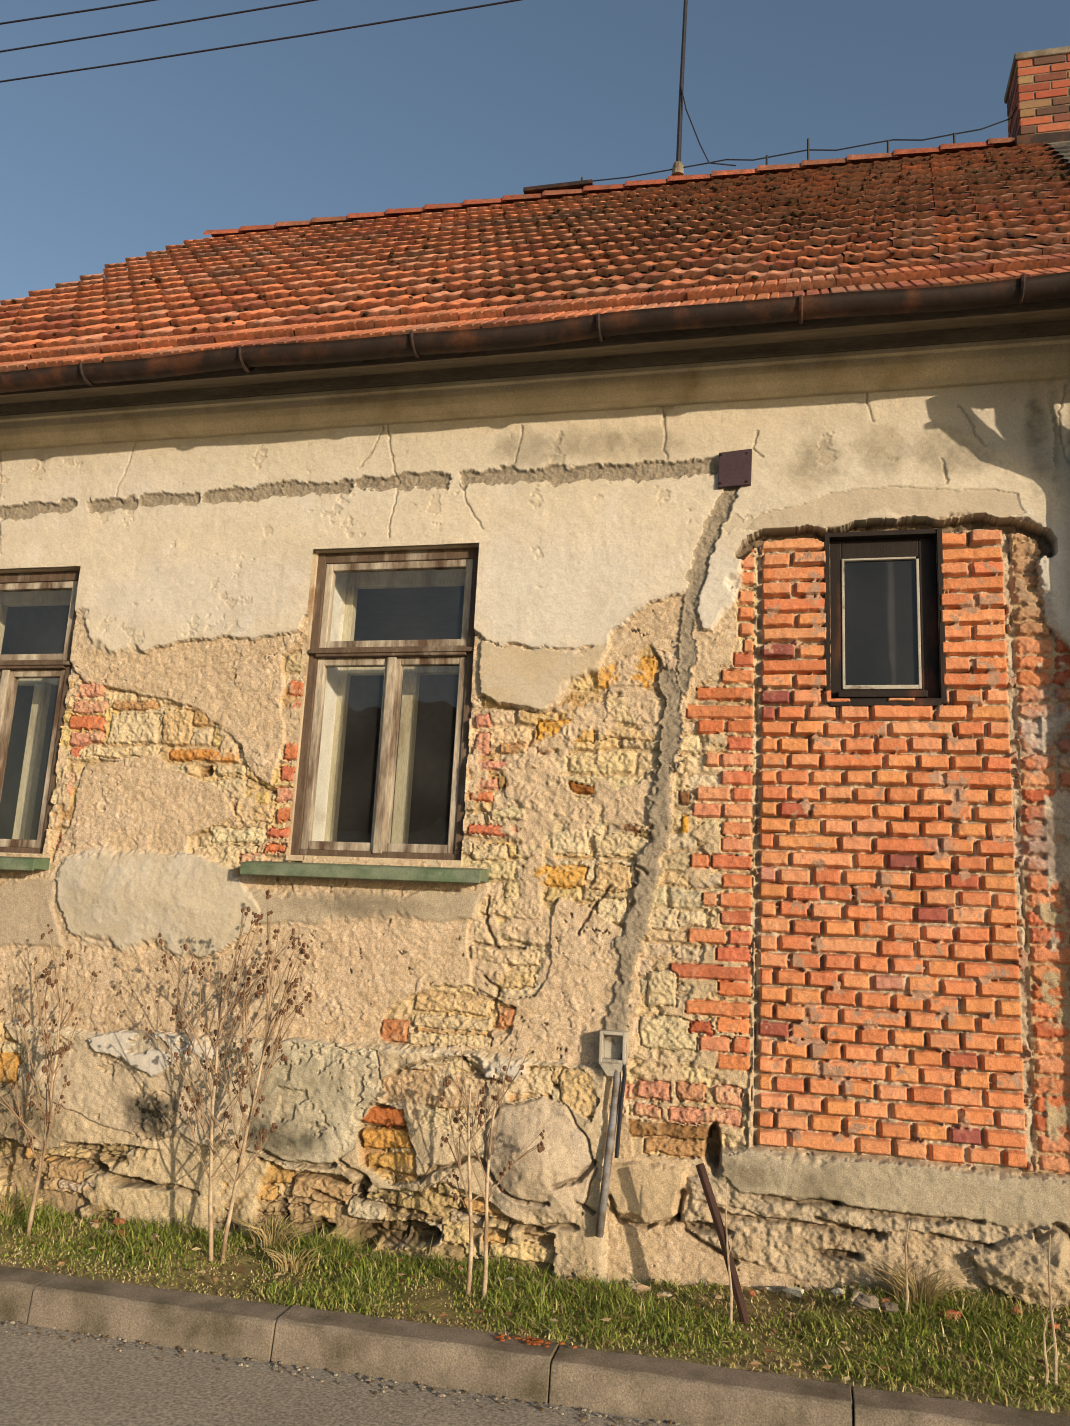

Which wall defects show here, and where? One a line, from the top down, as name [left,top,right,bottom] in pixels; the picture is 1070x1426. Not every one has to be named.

crack [0,451,8,556]
crack [357,425,401,539]
crack [458,483,484,530]
crack [512,424,524,466]
crack [649,646,668,673]
spalling [48,632,308,876]
crack [245,776,277,796]
spalling [360,485,1070,1197]
spalling [0,1020,24,1098]
peeling [87,1028,224,1079]
peeling [0,1138,412,1247]
spalling [682,1199,1023,1303]